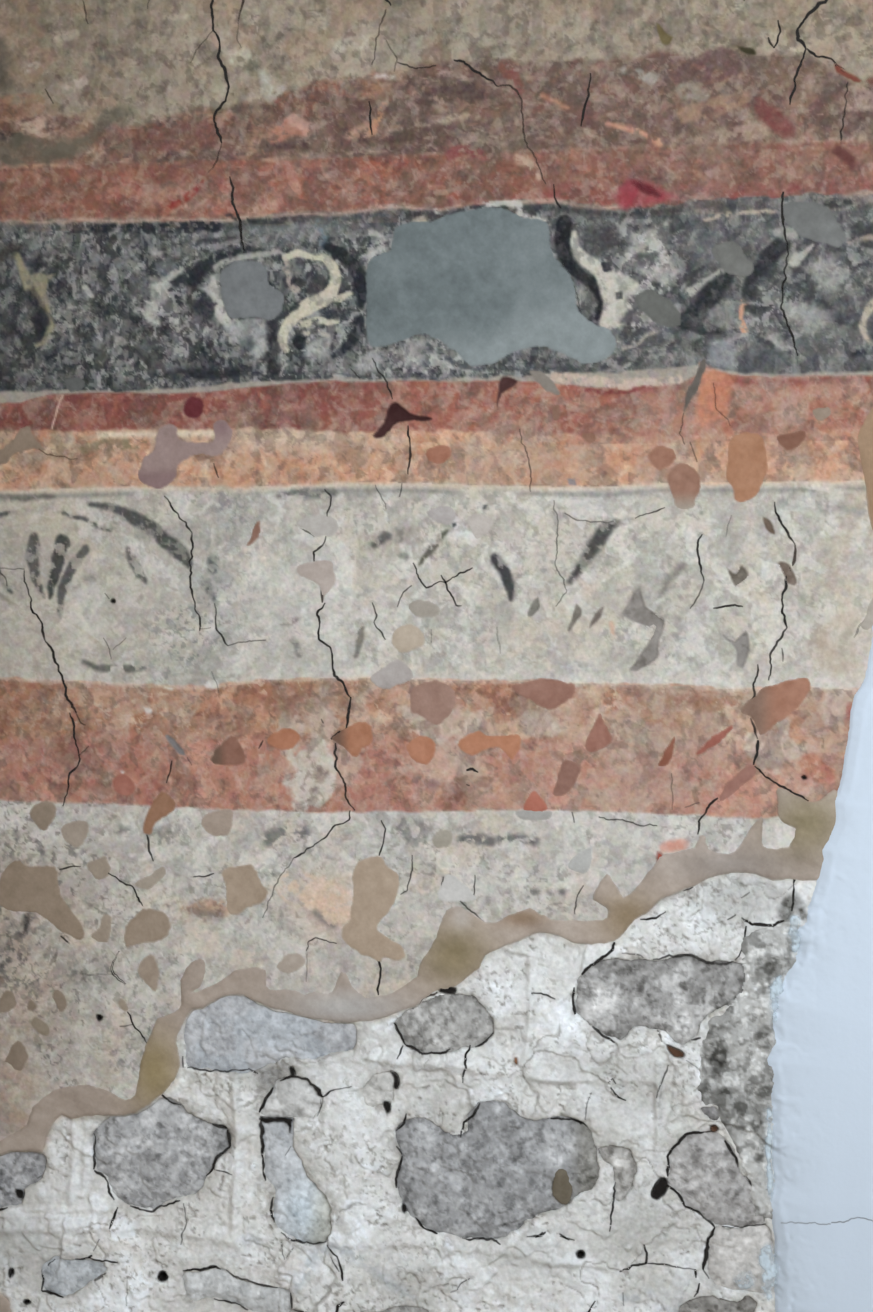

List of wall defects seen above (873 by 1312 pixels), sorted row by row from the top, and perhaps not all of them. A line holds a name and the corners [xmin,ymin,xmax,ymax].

crack [210,0,244,143]
crack [768,0,848,141]
crack [229,176,244,253]
crack [780,192,798,356]
crack [24,570,85,806]
crack [302,489,332,561]
crack [267,592,413,909]
crack [372,563,473,640]
crack [690,534,743,609]
crack [750,502,809,801]
crack [441,877,478,917]
flaking render [0,800,817,1141]